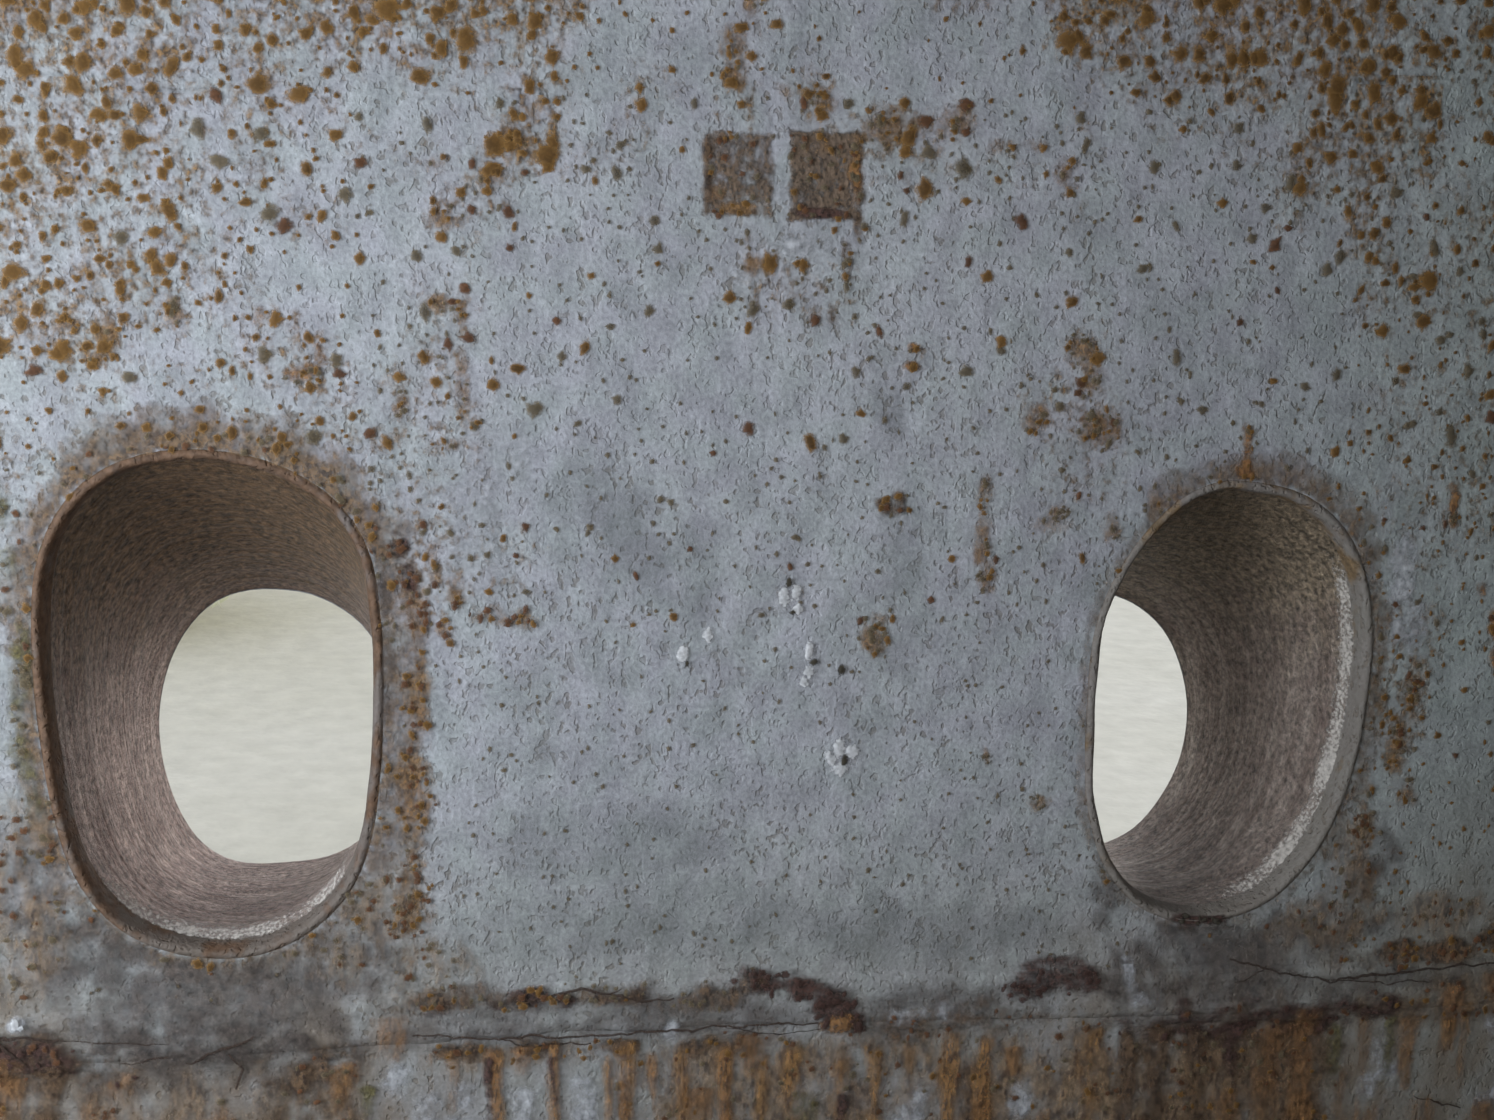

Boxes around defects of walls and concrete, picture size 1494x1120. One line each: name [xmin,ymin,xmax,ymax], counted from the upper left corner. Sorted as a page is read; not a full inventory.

corrosion [710,0,783,108]
corrosion [0,0,649,414]
corrosion [679,68,1027,334]
corrosion [637,216,662,278]
crack [1230,959,1494,985]
crack [412,987,820,1048]
crack [0,1036,255,1090]